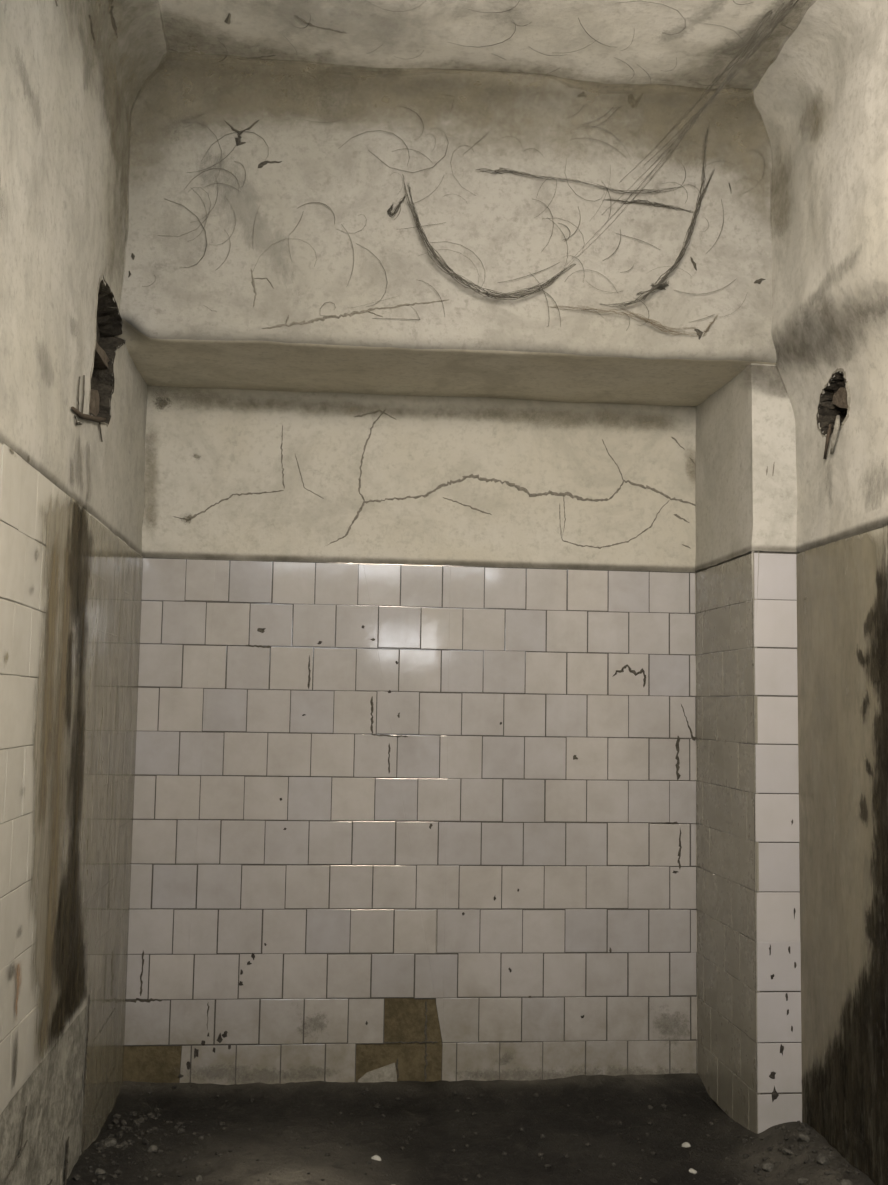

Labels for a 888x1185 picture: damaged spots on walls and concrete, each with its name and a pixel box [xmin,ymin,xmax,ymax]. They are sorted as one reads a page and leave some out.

crack [89,0,118,41]
spalling [71,273,126,442]
crack [173,425,324,522]
crack [324,409,695,549]
spalling [816,368,851,459]
water stain [31,447,143,1154]
water stain [796,533,888,1185]
peeling [0,995,90,1185]
peeling [123,1046,182,1083]
peeling [355,998,442,1083]